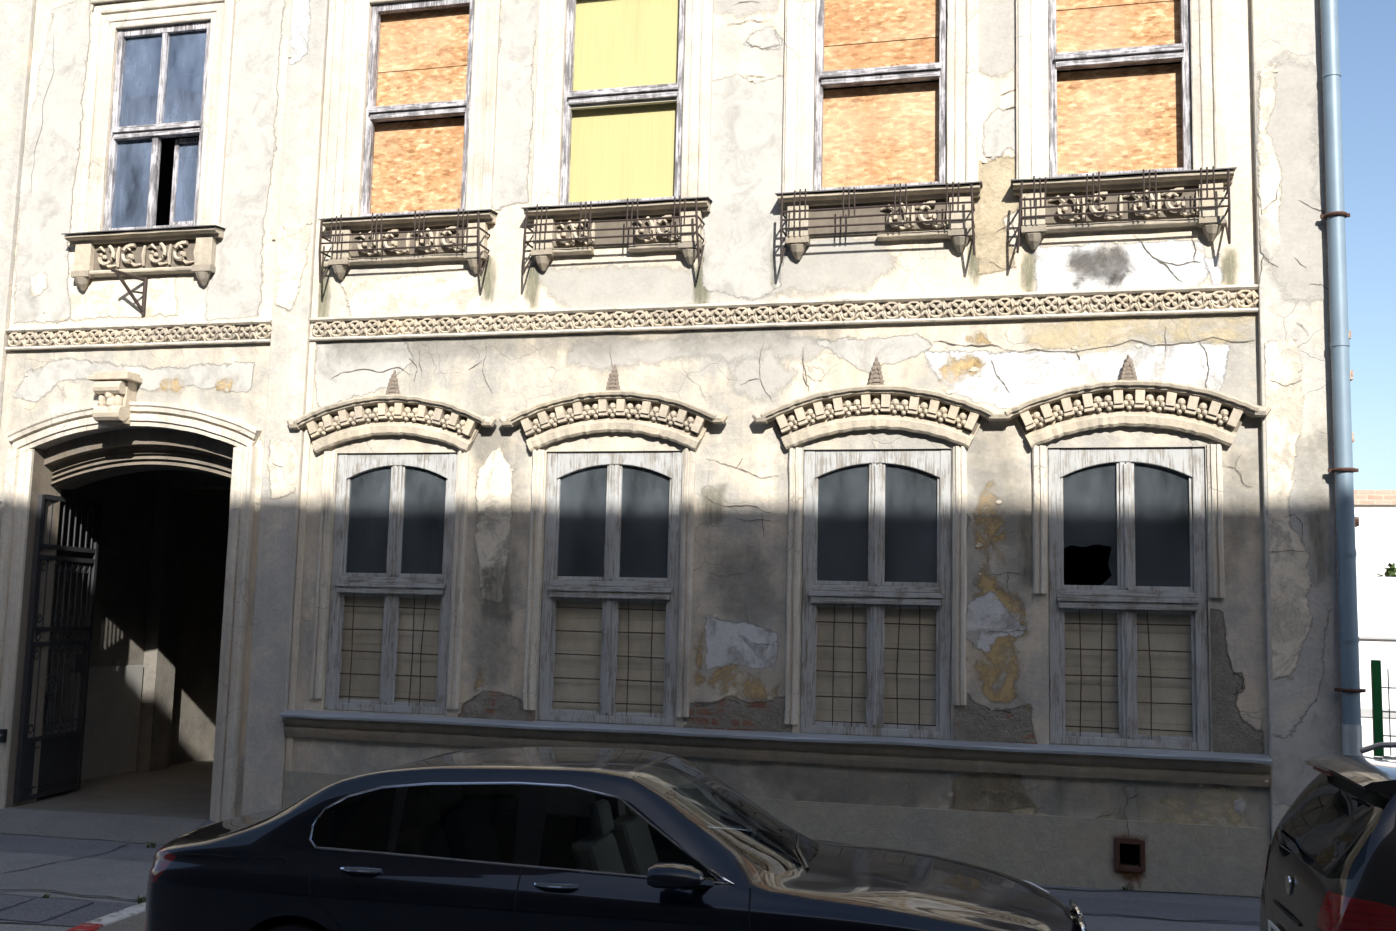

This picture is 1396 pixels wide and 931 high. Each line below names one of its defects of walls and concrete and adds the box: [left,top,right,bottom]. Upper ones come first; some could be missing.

peeling [205,0,311,321]
peeling [1256,50,1324,302]
crack [1134,235,1198,282]
peeling [567,315,1254,409]
peeling [474,444,514,603]
spalling [458,669,536,721]
spalling [682,614,792,733]
spalling [954,481,1037,744]
peeling [1210,338,1337,806]